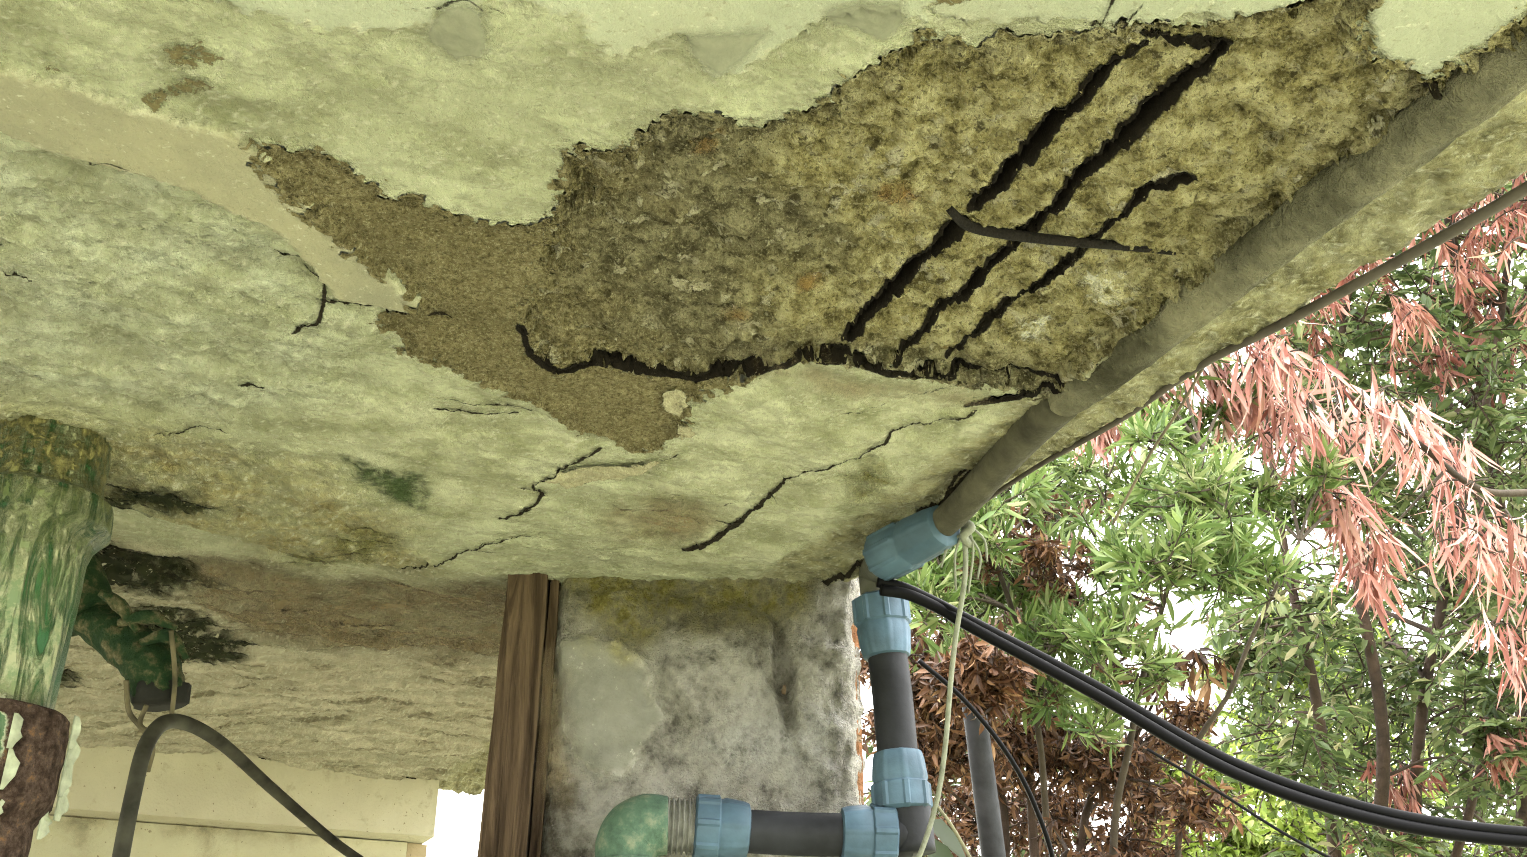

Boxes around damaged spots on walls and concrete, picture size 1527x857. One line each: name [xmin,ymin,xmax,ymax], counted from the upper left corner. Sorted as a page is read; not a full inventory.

spalling [240,0,1527,489]
water stain [103,484,216,515]
crack [402,447,602,569]
crack [682,381,977,552]
crack [821,559,863,586]